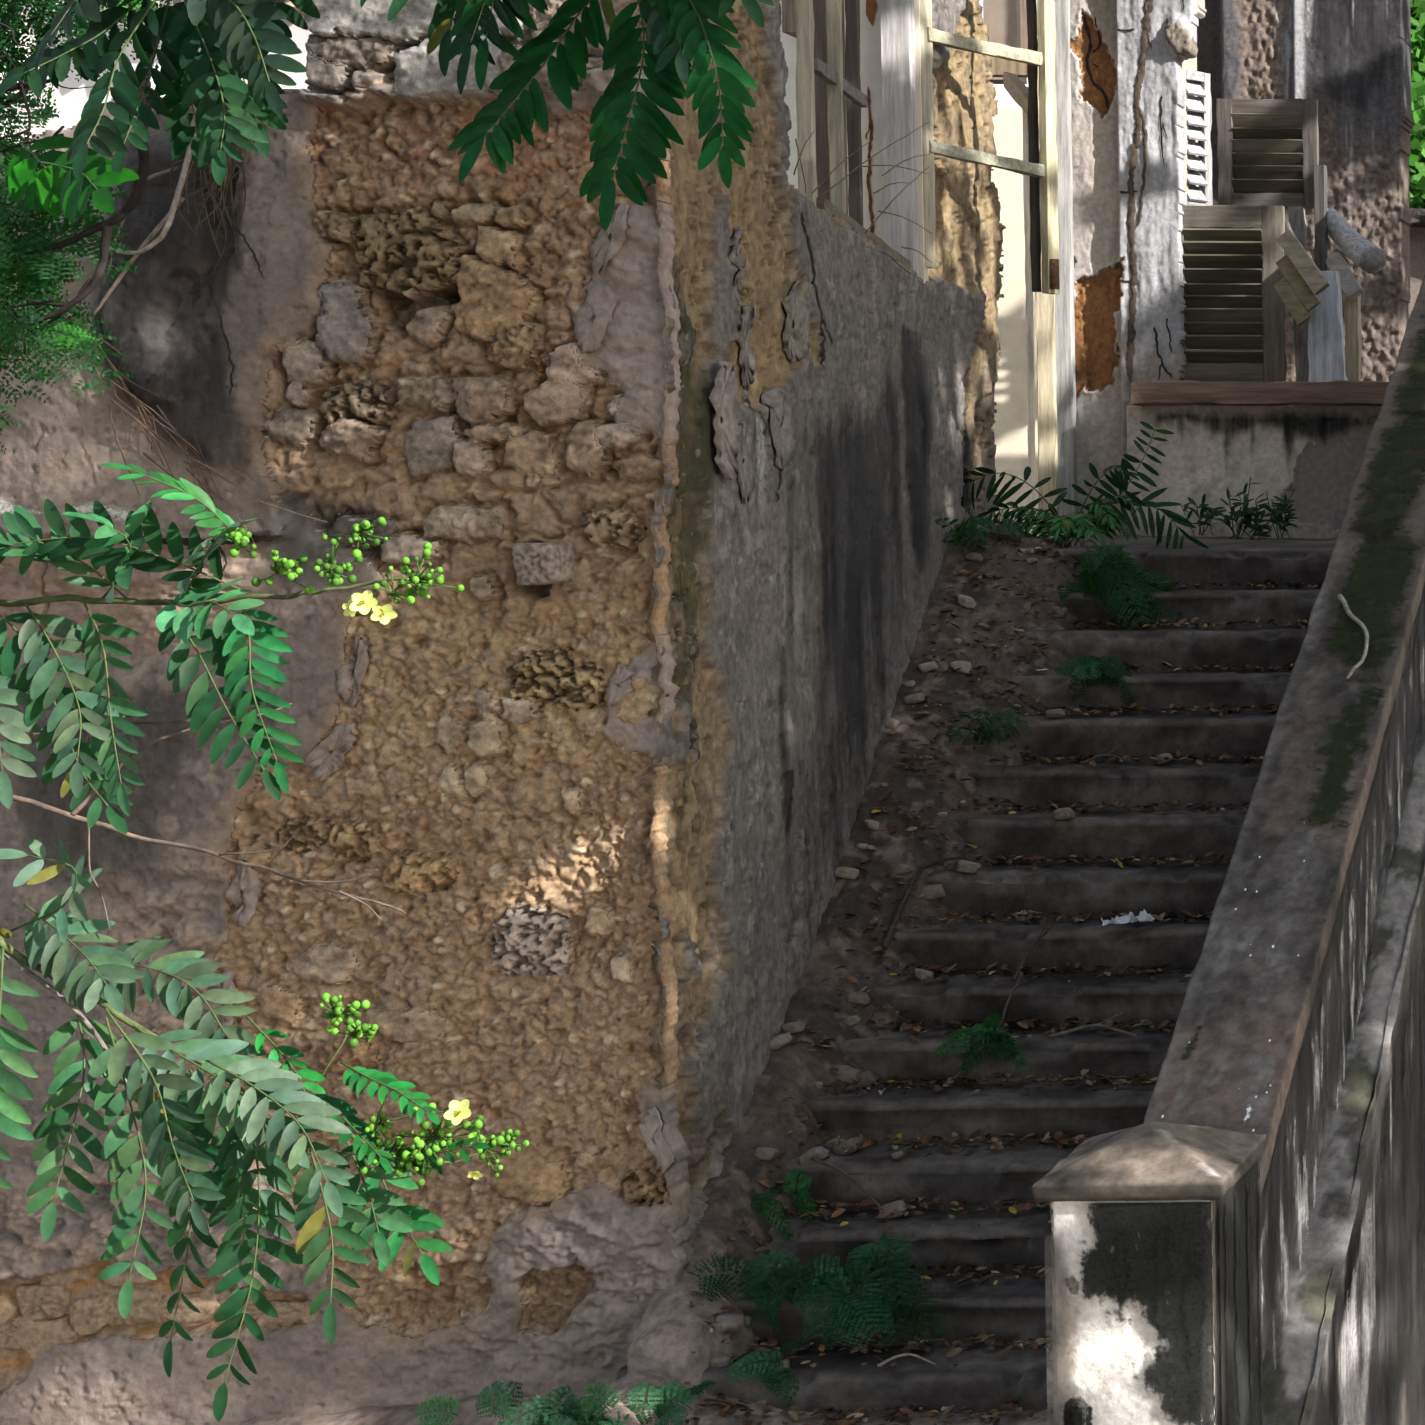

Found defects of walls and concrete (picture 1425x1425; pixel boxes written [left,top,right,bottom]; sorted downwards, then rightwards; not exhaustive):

spalling [866,0,877,26]
spalling [1070,7,1117,119]
crack [1083,0,1185,398]
spalling [1074,256,1124,407]
leakage [742,396,766,503]
leakage [1156,413,1369,453]
leakage [807,329,931,864]
spalling [200,87,680,1338]
leakage [1044,605,1425,1425]
spalling [0,1261,320,1393]